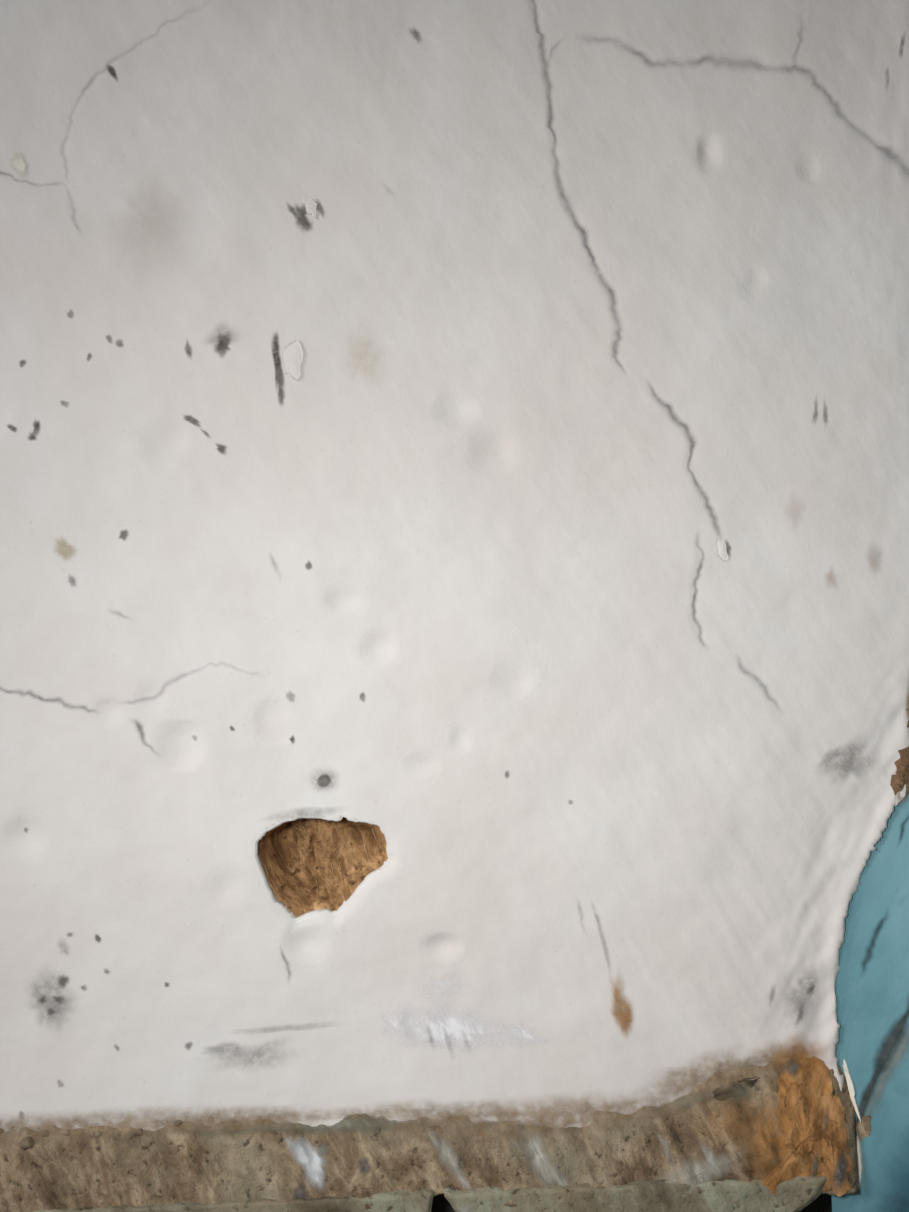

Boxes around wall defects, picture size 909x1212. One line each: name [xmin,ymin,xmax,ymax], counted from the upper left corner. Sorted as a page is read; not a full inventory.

spalling [890,746,909,806]
spalling [253,813,391,922]
spalling [758,1045,863,1196]